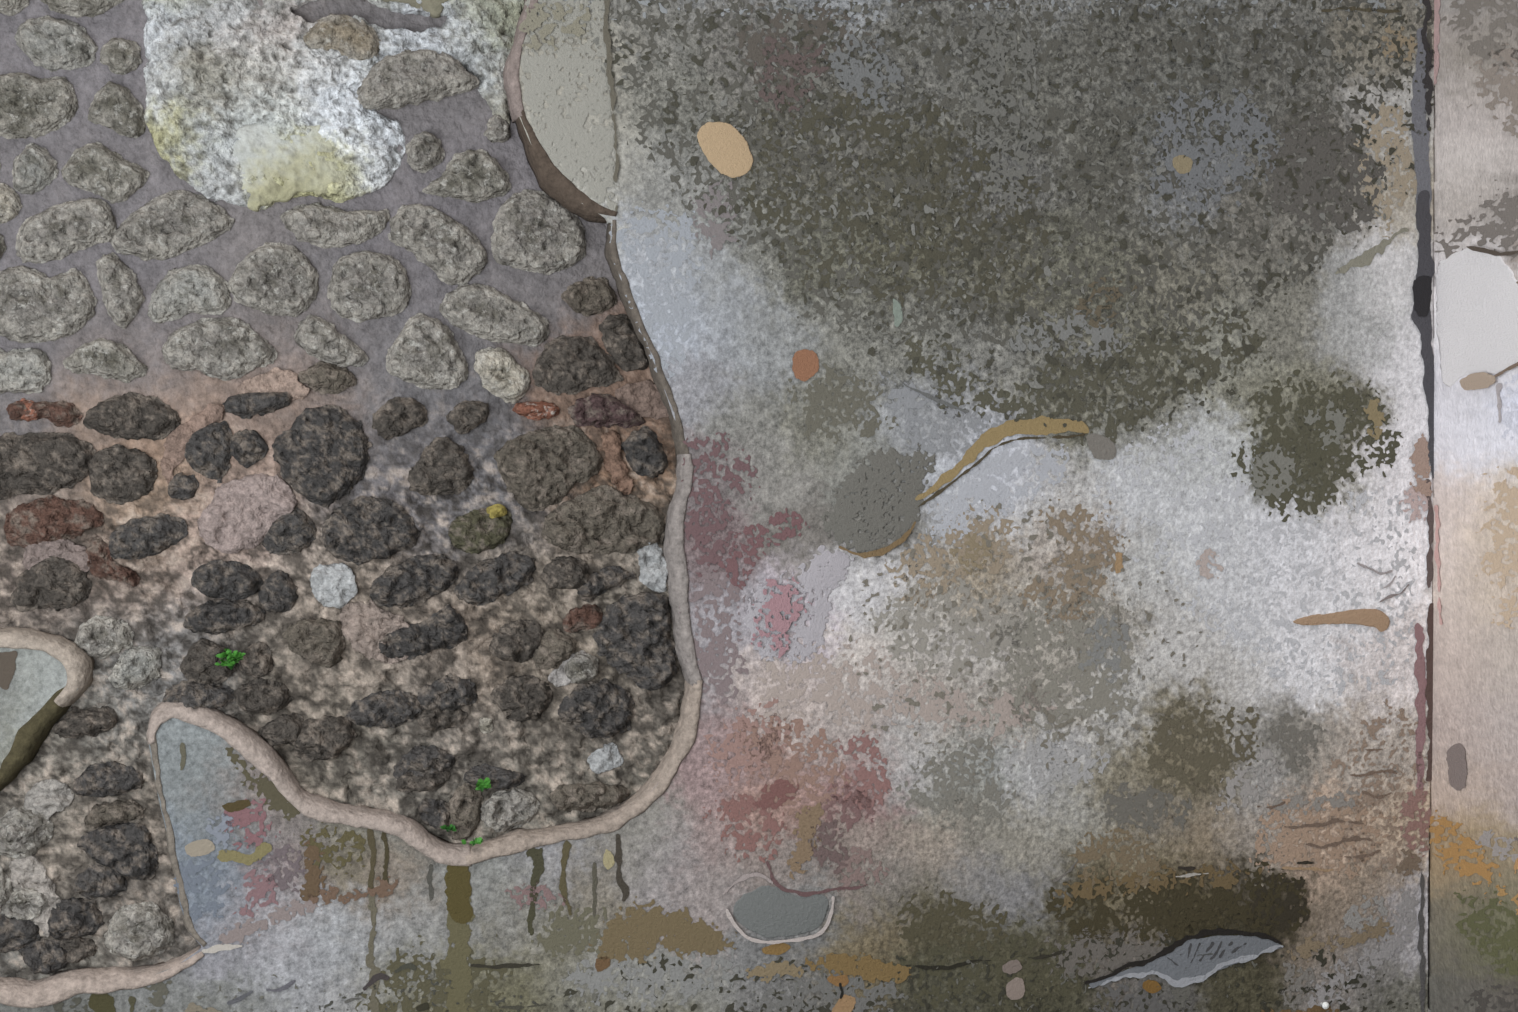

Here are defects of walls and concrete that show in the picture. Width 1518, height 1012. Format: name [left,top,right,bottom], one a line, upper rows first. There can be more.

leakage [817,28,909,115]
leakage [955,9,1048,209]
leakage [1136,82,1417,241]
leakage [1008,309,1132,367]
leakage [1304,399,1354,450]
leakage [1248,443,1303,508]
spalling [0,651,18,690]
leakage [185,839,272,866]
leakage [367,829,389,889]
leakage [526,840,572,936]
leakage [592,849,615,917]
spalling [1088,935,1283,988]